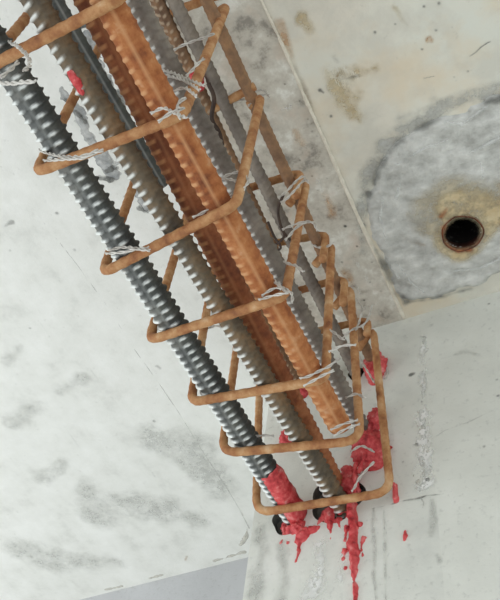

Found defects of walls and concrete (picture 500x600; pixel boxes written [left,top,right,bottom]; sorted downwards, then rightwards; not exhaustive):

corrosion [415,179,500,261]